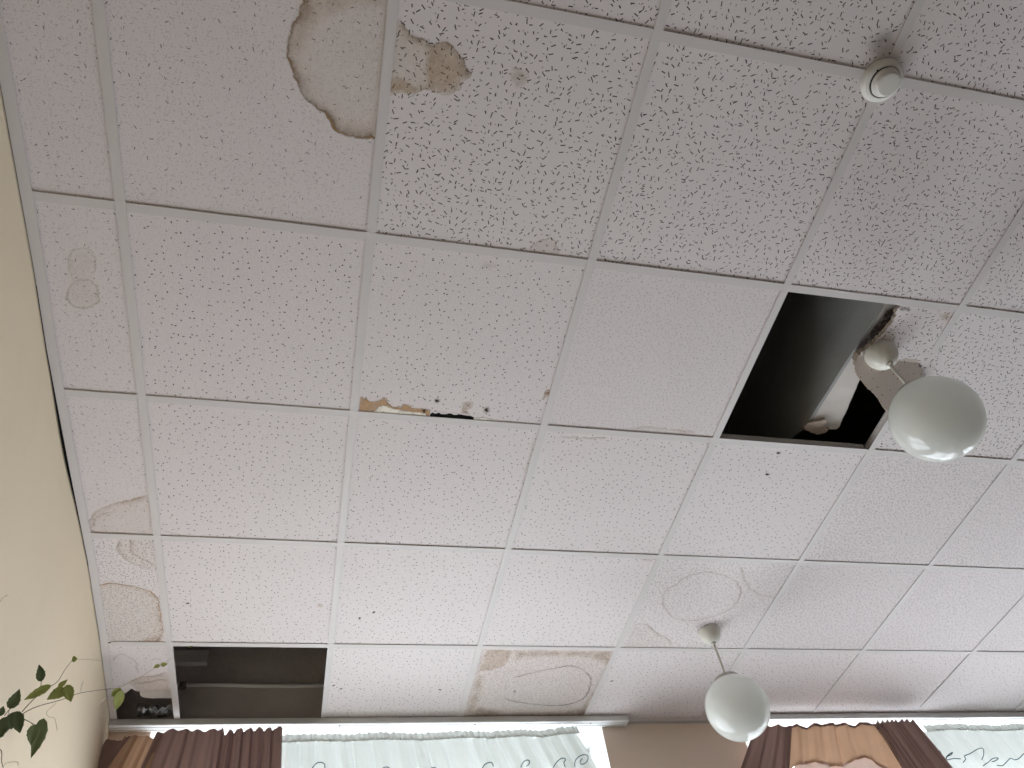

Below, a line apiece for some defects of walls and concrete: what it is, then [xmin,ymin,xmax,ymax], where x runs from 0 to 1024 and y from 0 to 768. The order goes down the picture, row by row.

water stain [287,0,305,86]
water stain [305,98,375,139]
spalling [423,400,501,422]